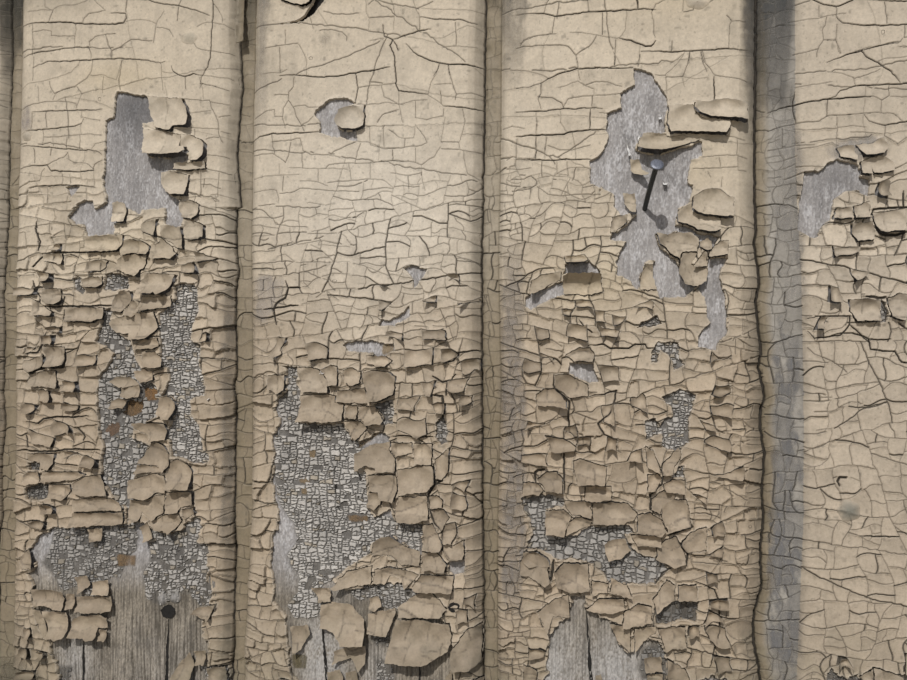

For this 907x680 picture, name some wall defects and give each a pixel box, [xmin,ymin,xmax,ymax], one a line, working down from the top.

crack [3,4,149,452]
peeling [12,93,233,680]
crack [230,413,238,624]
crack [176,11,312,390]
peeling [315,99,366,141]
peeling [266,300,485,680]
crack [288,0,488,503]
crack [428,472,443,549]
peeling [520,386,734,680]
peeling [590,70,749,363]
crack [514,0,907,680]
peeling [797,137,907,258]